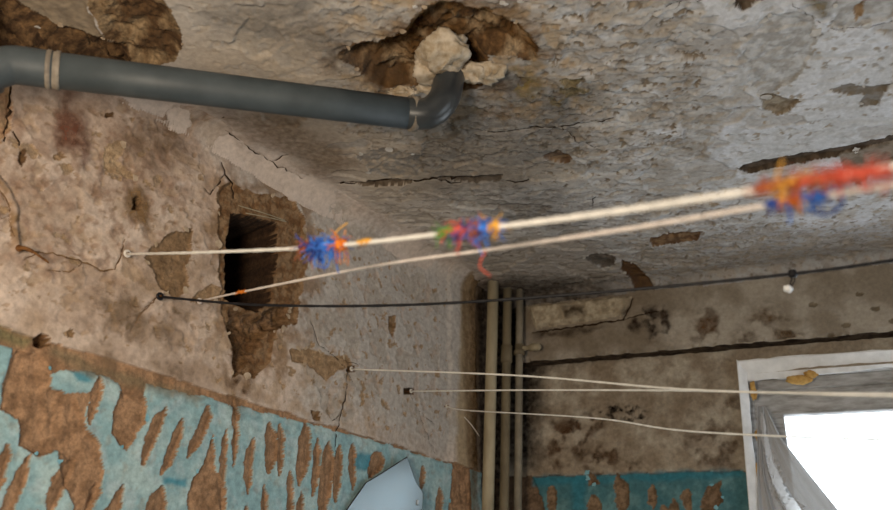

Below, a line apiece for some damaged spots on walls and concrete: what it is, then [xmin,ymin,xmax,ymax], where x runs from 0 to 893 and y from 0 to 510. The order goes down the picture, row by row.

spalling [0,0,184,65]
spalling [729,0,760,11]
crack [3,86,21,154]
spalling [336,0,711,187]
peeling [738,0,893,148]
crack [340,175,483,184]
crack [0,191,125,273]
flaking render [511,474,560,510]